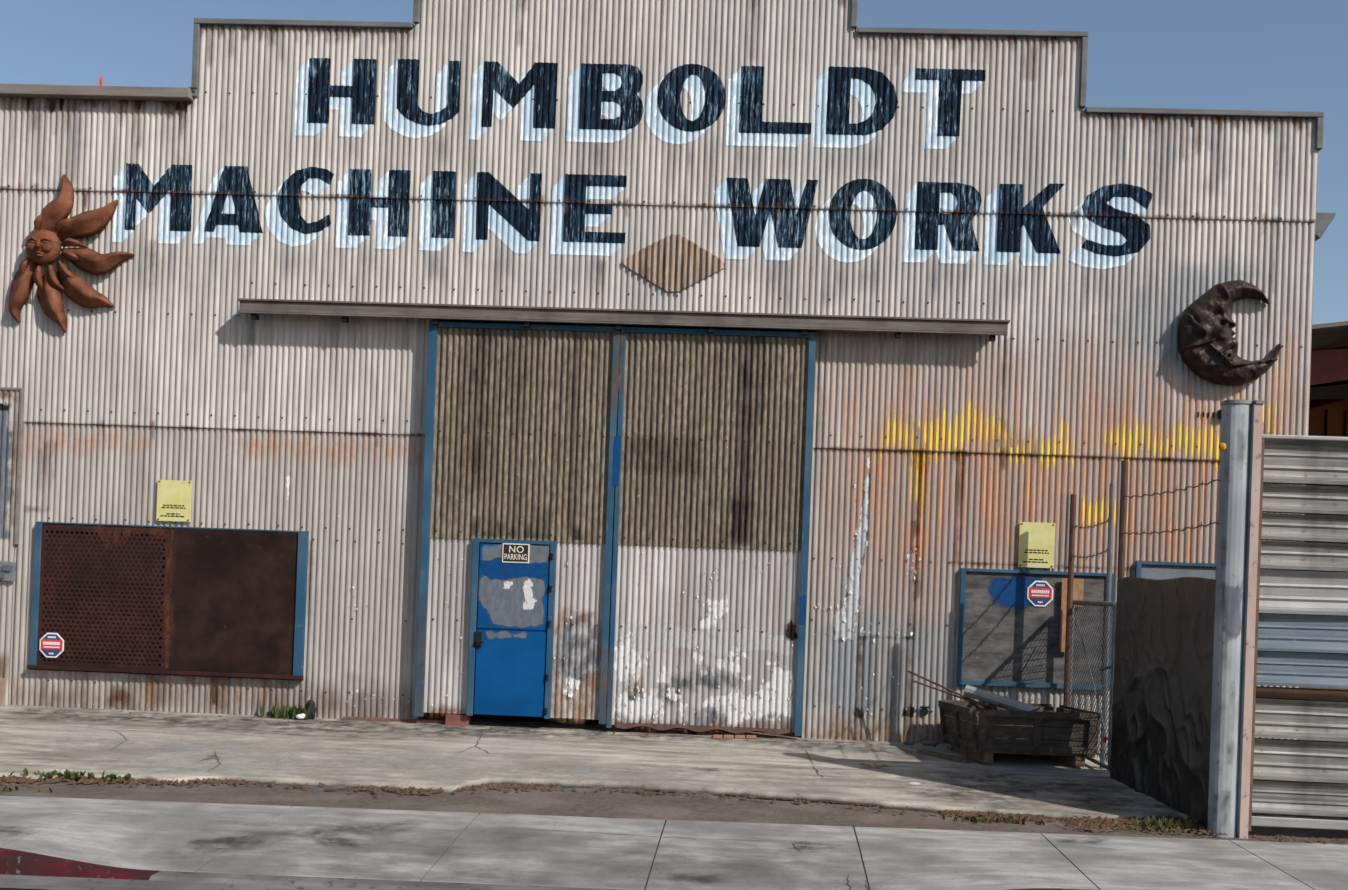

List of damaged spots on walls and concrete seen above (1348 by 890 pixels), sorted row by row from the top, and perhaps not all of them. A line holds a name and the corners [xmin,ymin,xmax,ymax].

rust [551,663,609,720]
peeling [612,567,797,728]
peeling [813,457,921,715]